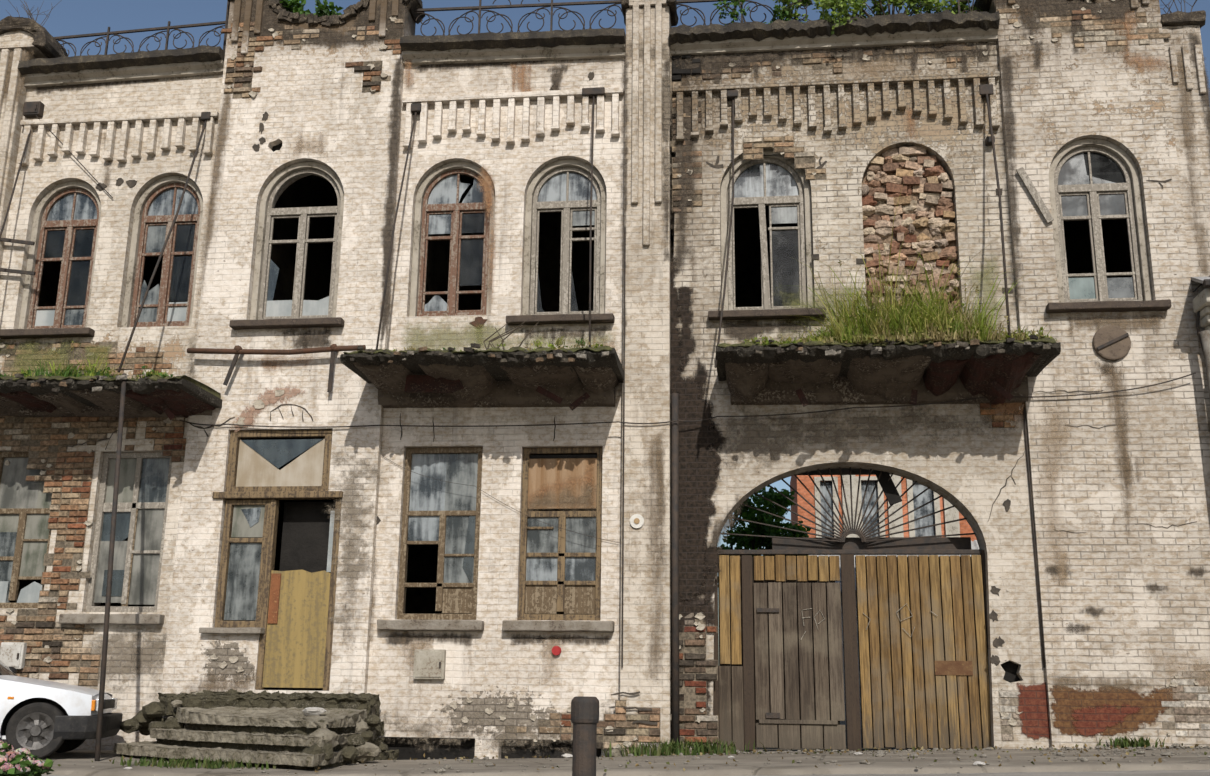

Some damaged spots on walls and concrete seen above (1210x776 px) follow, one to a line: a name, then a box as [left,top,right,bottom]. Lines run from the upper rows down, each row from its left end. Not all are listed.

spalling [221,19,330,99]
spalling [345,16,404,93]
spalling [670,0,1171,213]
spalling [0,340,177,393]
water stain [677,287,708,394]
spalling [0,416,189,686]
water stain [701,502,740,625]
spalling [596,573,719,754]
spalling [485,702,573,742]